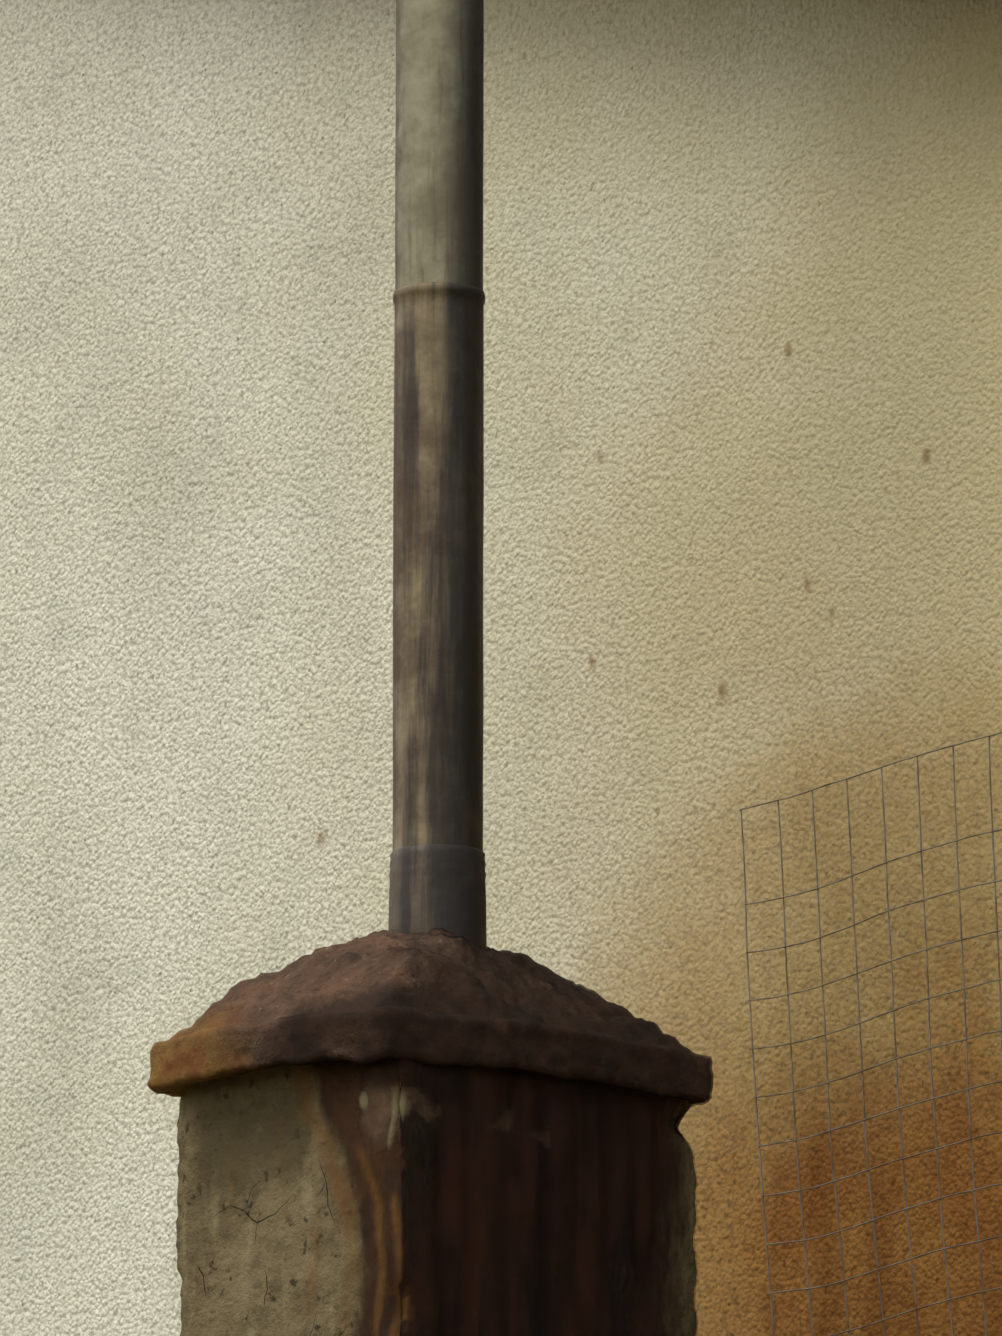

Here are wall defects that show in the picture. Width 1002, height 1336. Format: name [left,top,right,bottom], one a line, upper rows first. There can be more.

crack [214,1161,335,1242]
corrosion [300,1058,415,1336]